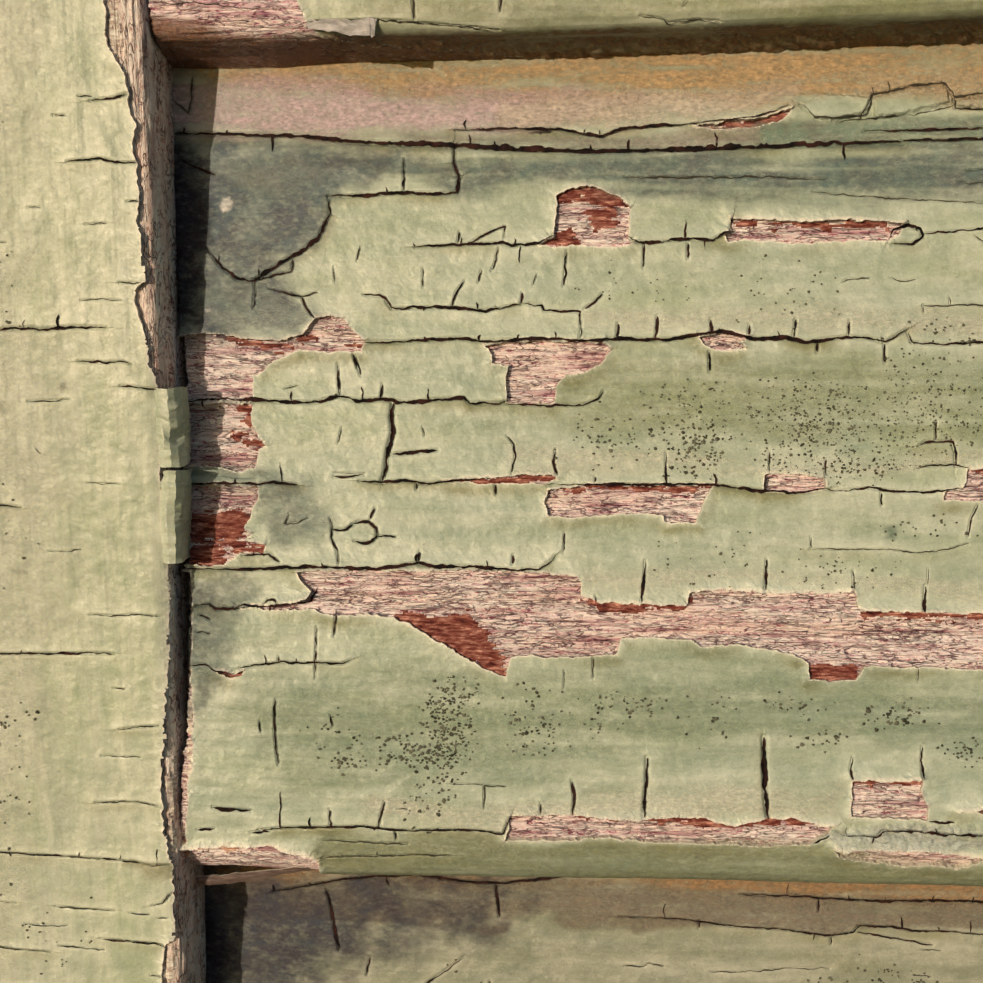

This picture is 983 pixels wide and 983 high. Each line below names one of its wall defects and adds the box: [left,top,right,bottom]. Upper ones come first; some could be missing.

crack [174,77,983,319]
leakage [178,141,983,338]
peeling [717,212,912,251]
peeling [476,333,619,411]
crack [188,226,983,494]
leakage [923,317,976,358]
peeling [96,0,560,983]
crack [547,421,978,579]
crack [183,508,556,634]
peeling [228,559,983,689]
peeling [495,747,983,875]
leakage [204,871,425,983]